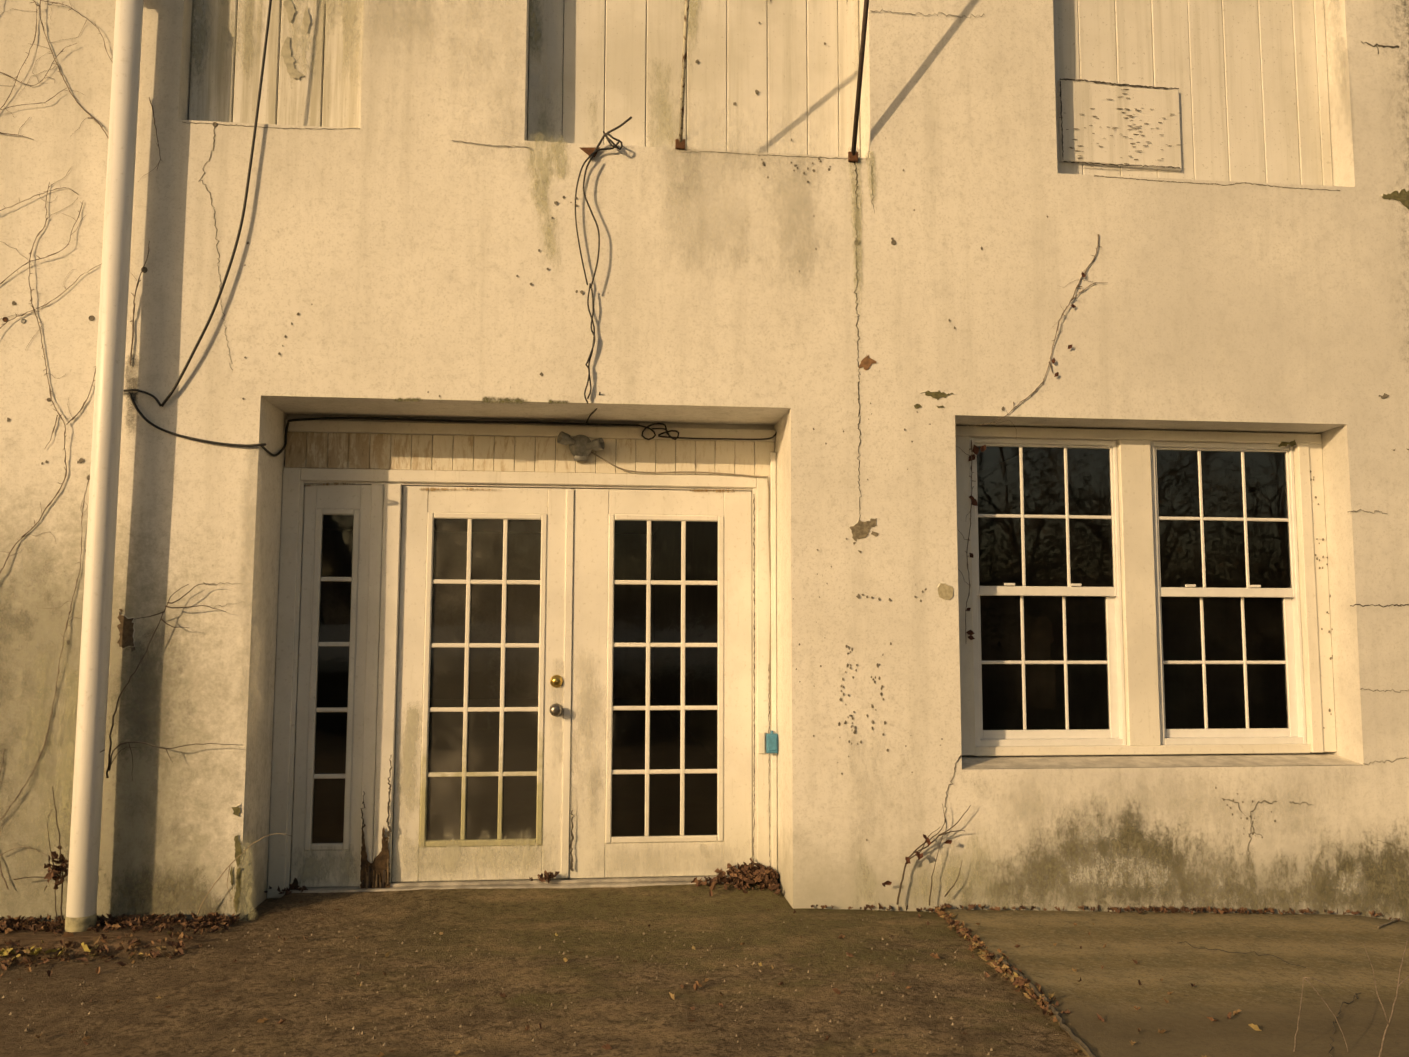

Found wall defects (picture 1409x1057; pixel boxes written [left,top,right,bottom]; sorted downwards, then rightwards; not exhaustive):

peeling [1380,188,1409,209]
crack [680,151,875,519]
peeling [859,355,876,370]
peeling [846,518,879,553]
peeling [117,609,135,652]
water stain [985,811,1409,922]